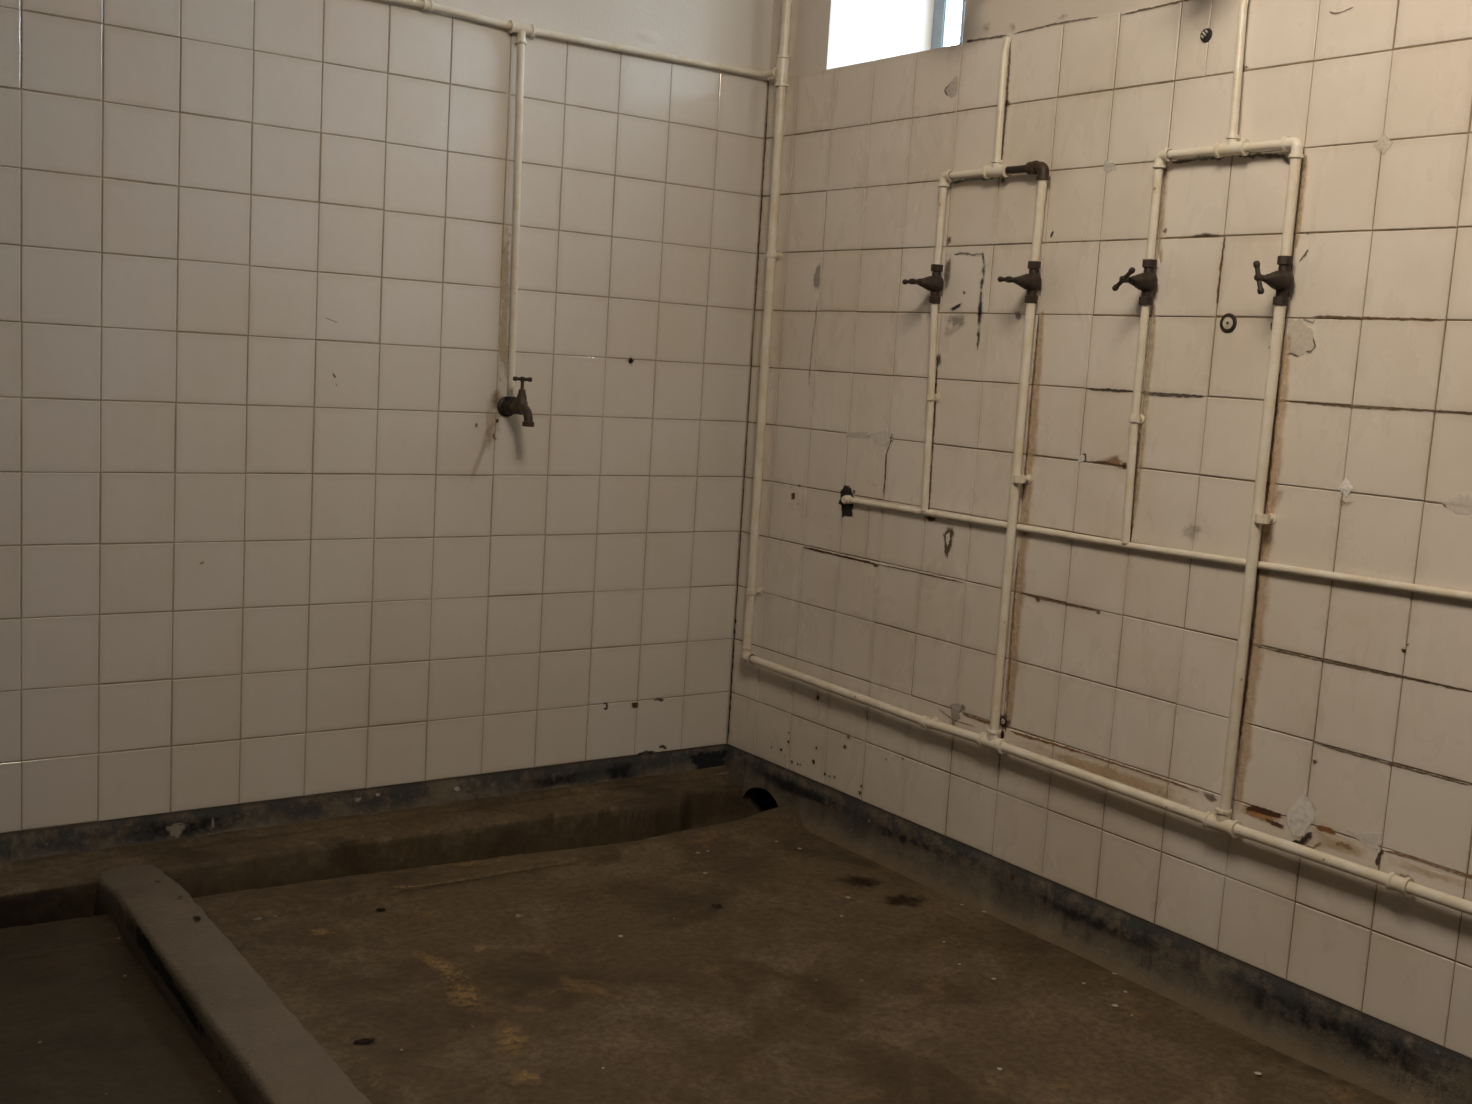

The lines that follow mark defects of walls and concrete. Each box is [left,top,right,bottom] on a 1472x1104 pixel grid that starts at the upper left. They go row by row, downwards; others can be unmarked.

corrosion [1022,318,1039,501]
corrosion [1266,374,1280,502]
corrosion [1238,545,1261,750]
damp [1253,645,1472,692]
damp [1313,742,1472,786]